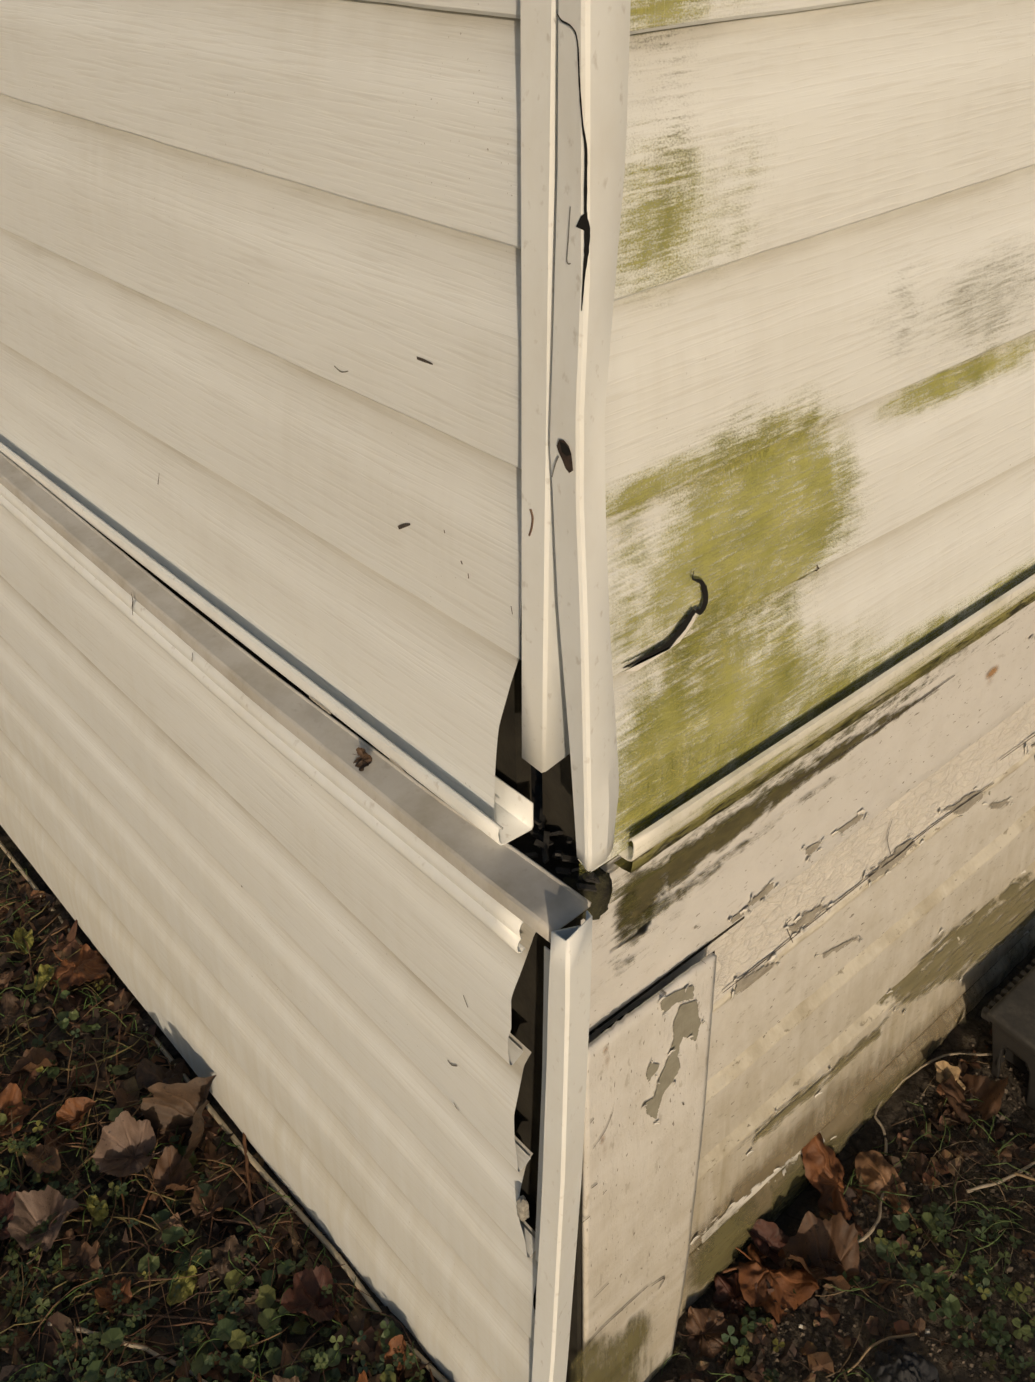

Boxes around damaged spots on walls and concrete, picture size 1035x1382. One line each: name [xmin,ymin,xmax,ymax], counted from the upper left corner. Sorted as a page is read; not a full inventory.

crack [557,14,590,311]
peeling [939,788,1015,817]
peeling [801,810,869,863]
peeling [863,835,925,887]
peeling [729,881,780,923]
peeling [730,954,782,1001]
peeling [642,984,705,1126]